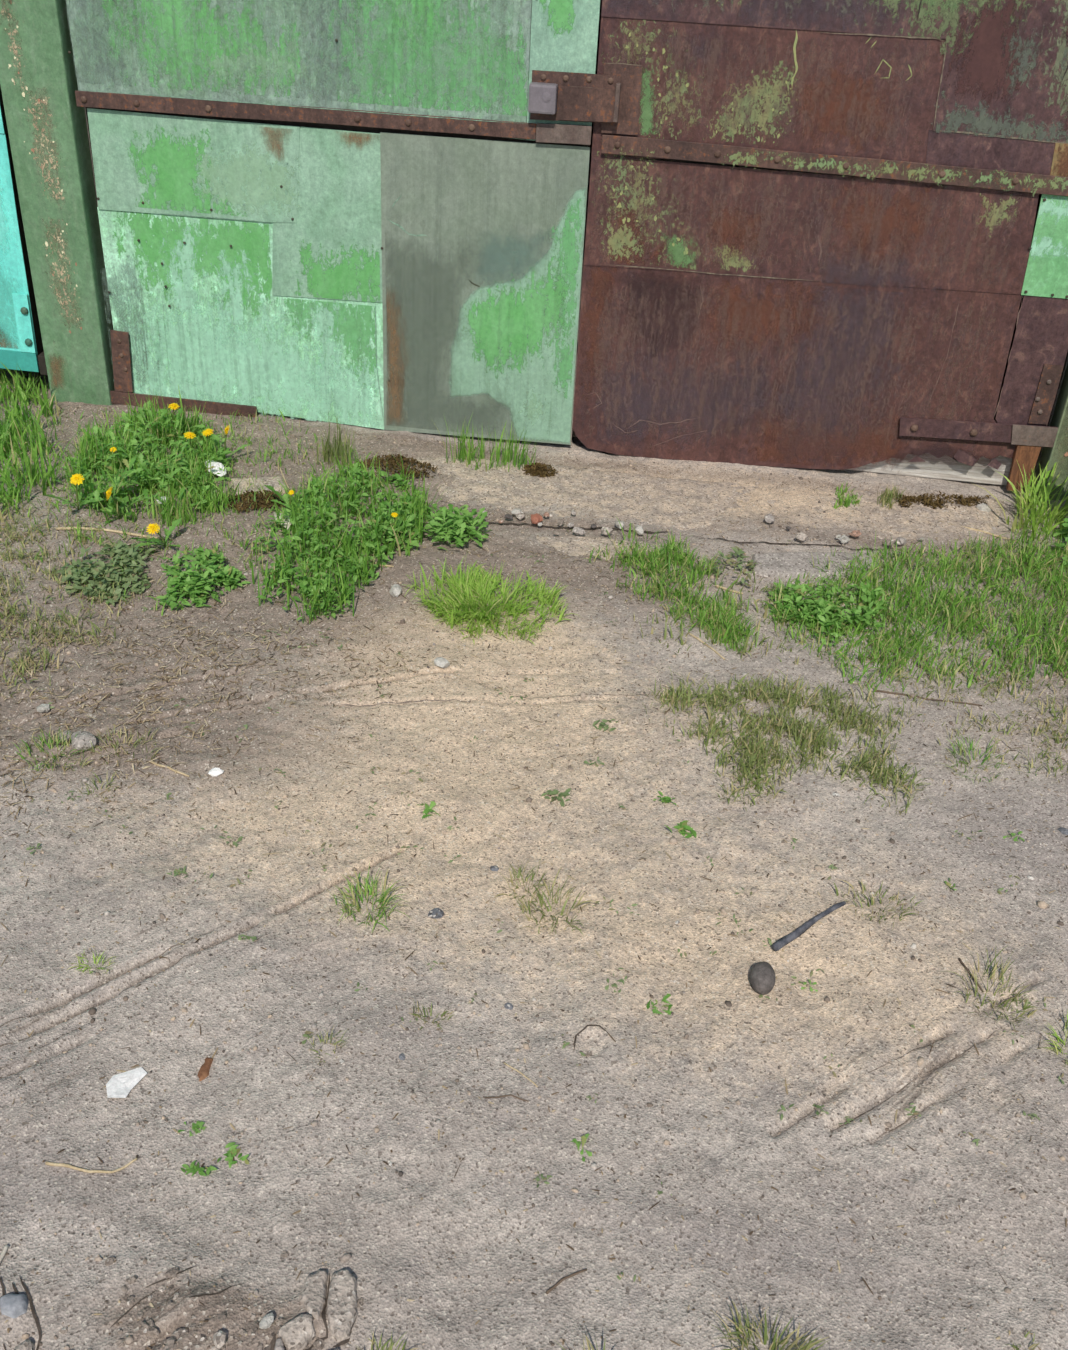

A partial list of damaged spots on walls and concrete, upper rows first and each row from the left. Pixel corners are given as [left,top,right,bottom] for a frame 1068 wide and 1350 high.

peeling [449,0,1068,443]